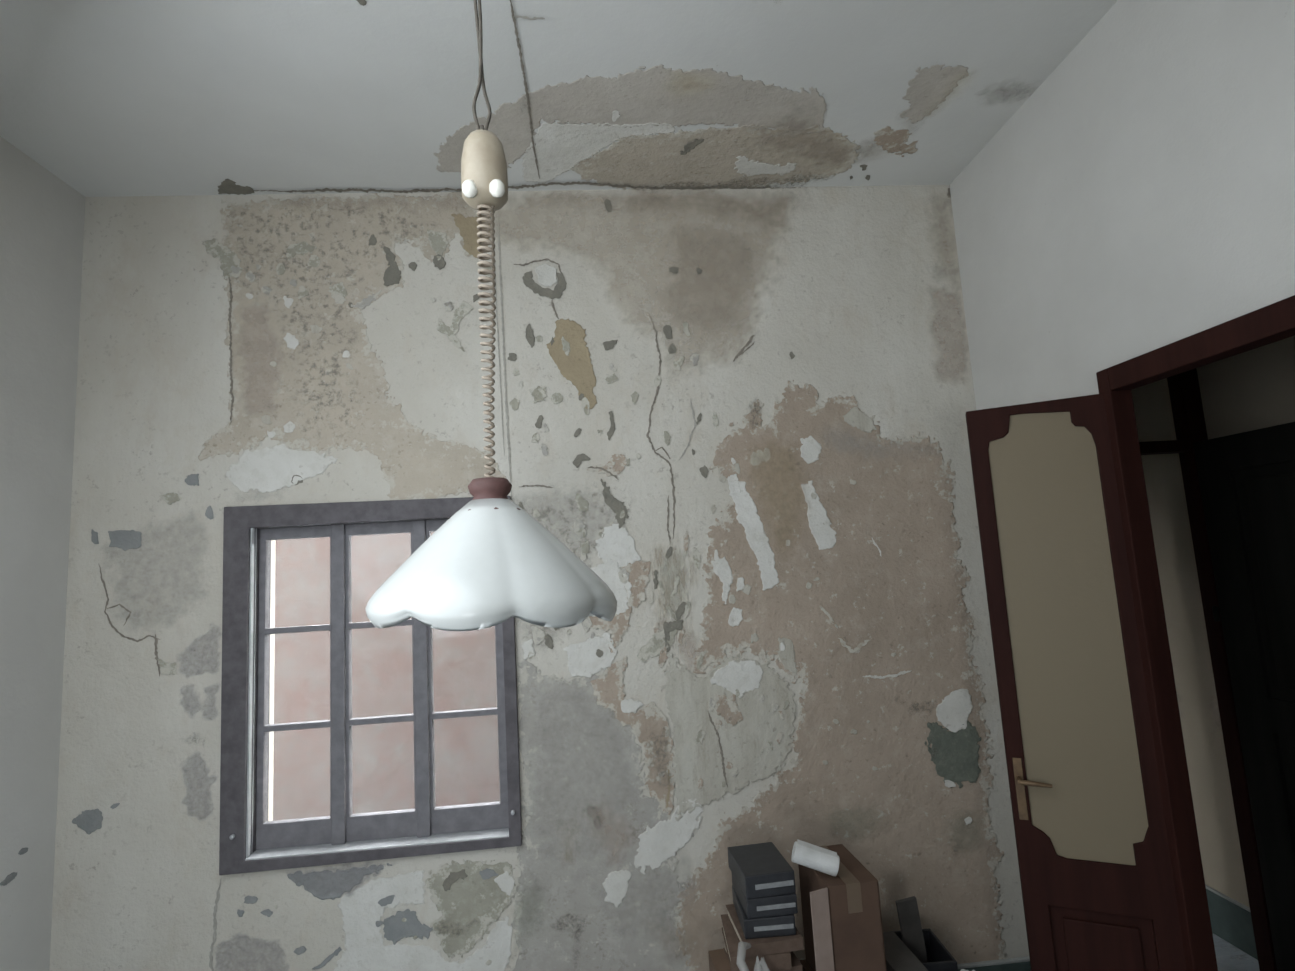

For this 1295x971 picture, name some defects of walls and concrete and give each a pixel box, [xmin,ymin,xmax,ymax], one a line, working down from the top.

crack [218,179,462,195]
crack [508,0,796,190]
spalling [433,64,969,212]
peeling [160,192,506,505]
crack [494,222,512,500]
spalling [507,258,641,480]
crack [646,314,696,540]
crack [733,335,755,362]
peeling [91,529,142,551]
damp [574,479,629,568]
spalling [563,380,1007,971]
peeling [312,859,517,971]